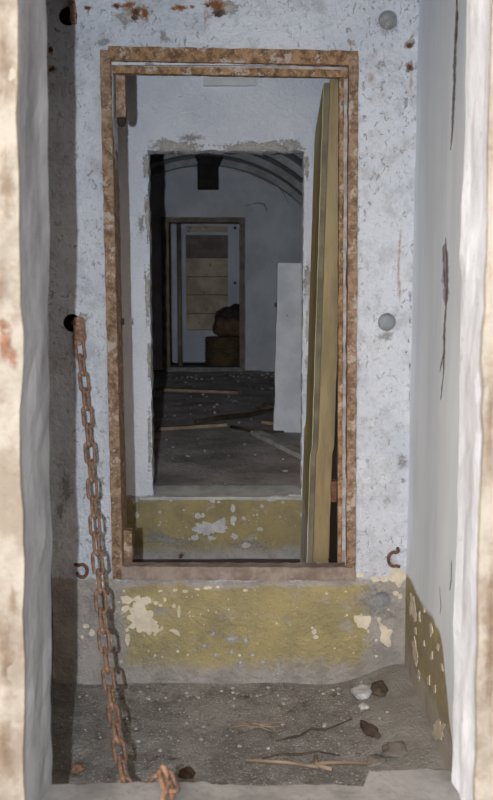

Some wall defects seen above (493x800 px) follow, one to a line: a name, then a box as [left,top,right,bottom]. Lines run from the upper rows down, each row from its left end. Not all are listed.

crack [450,0,458,150]
crack [440,238,448,400]
peeling [191,504,251,548]
peeling [120,590,180,646]
peeling [354,568,444,693]